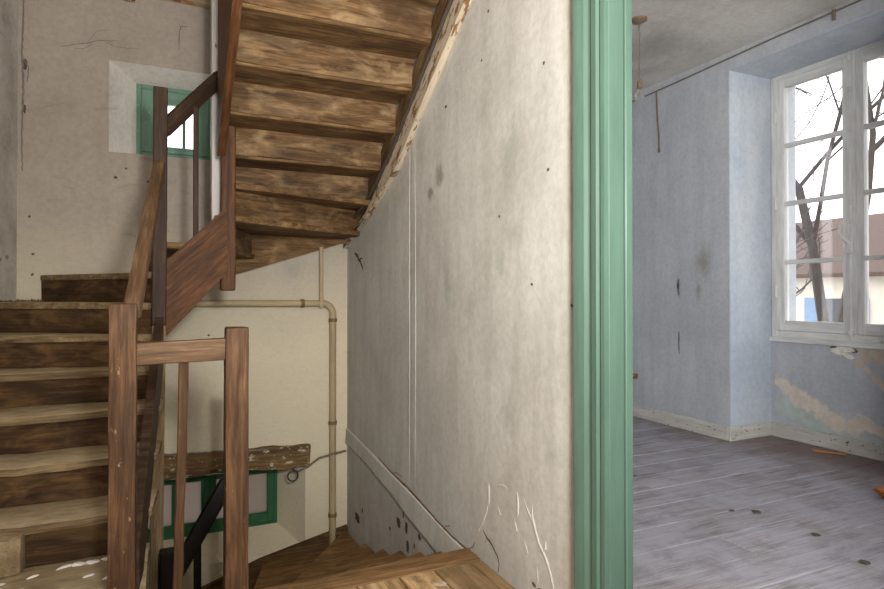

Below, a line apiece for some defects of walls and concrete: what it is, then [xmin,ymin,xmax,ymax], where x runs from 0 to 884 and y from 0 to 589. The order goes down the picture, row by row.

peeling [830,339,884,391]
peeling [774,374,884,445]